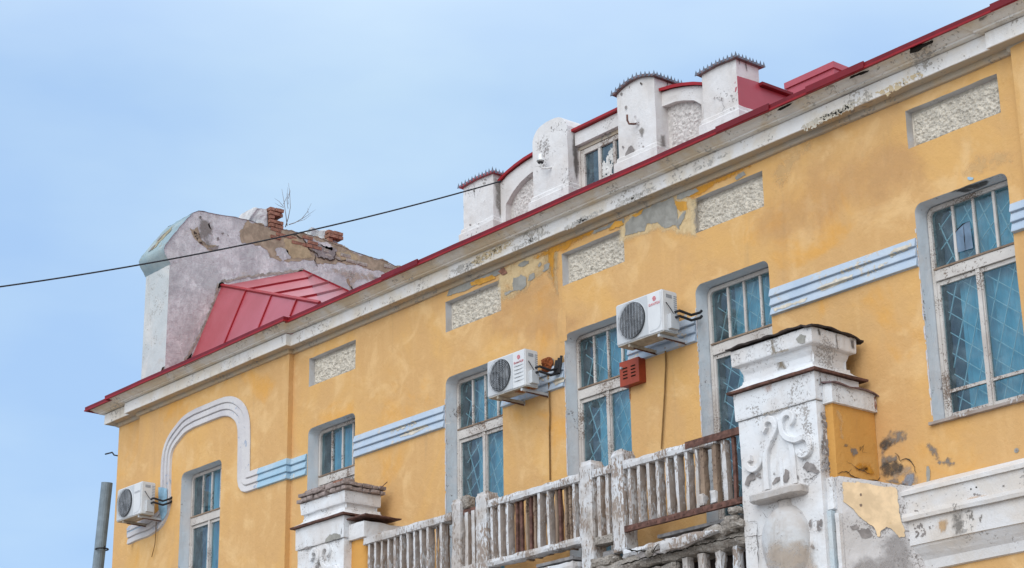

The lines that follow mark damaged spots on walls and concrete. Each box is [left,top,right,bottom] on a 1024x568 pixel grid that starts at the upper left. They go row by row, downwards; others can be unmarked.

peeling [801,72,923,131]
peeling [563,165,750,241]
spalling [184,216,400,361]
peeling [447,231,557,300]
peeling [842,482,933,541]